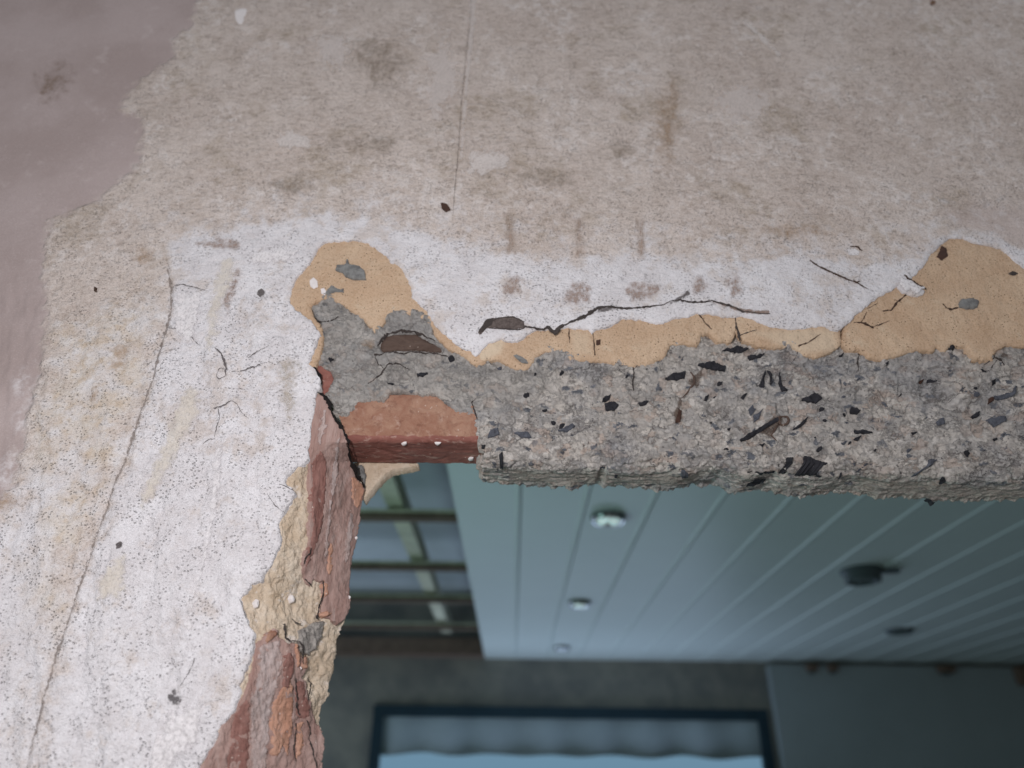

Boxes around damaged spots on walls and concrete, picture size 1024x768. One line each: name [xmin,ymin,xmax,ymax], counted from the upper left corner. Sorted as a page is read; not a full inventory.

crack [478,290,770,355]
spalling [290,239,1024,371]
flaking render [200,628,325,768]